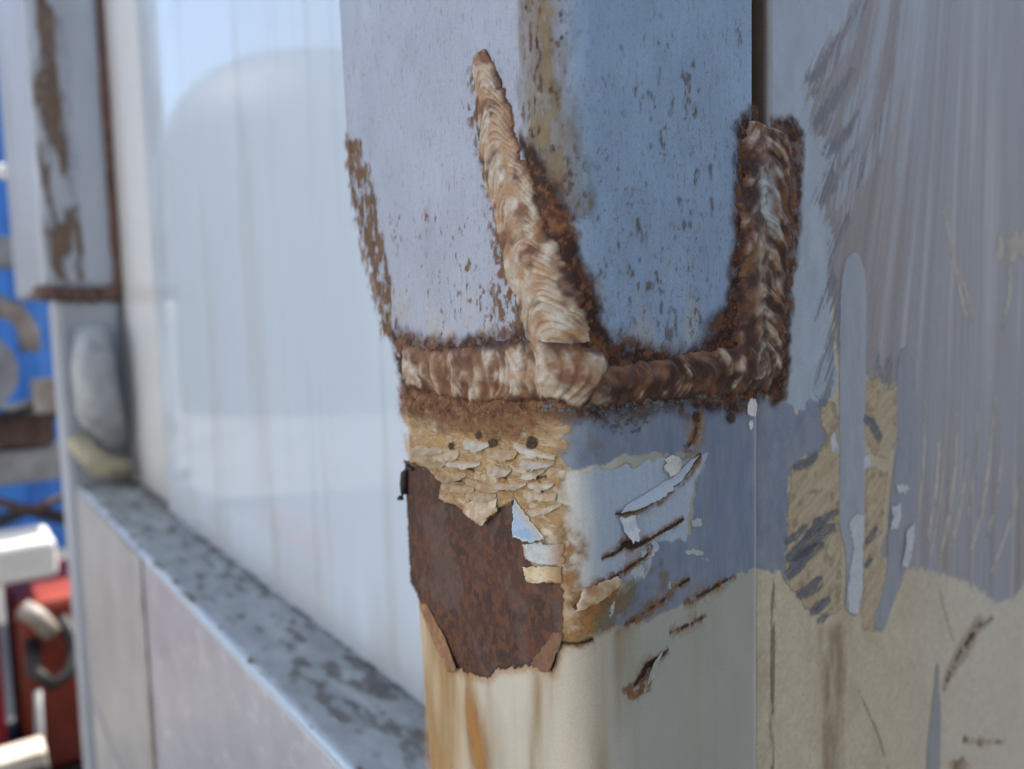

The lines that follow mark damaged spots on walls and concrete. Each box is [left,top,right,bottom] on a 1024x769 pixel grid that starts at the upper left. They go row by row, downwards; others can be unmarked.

rust [345,116,804,441]
rust [519,0,758,367]
rust [404,460,616,769]
peeling [402,393,757,538]
rust [623,679,652,699]
peeling [630,539,660,581]
peeling [786,374,915,631]